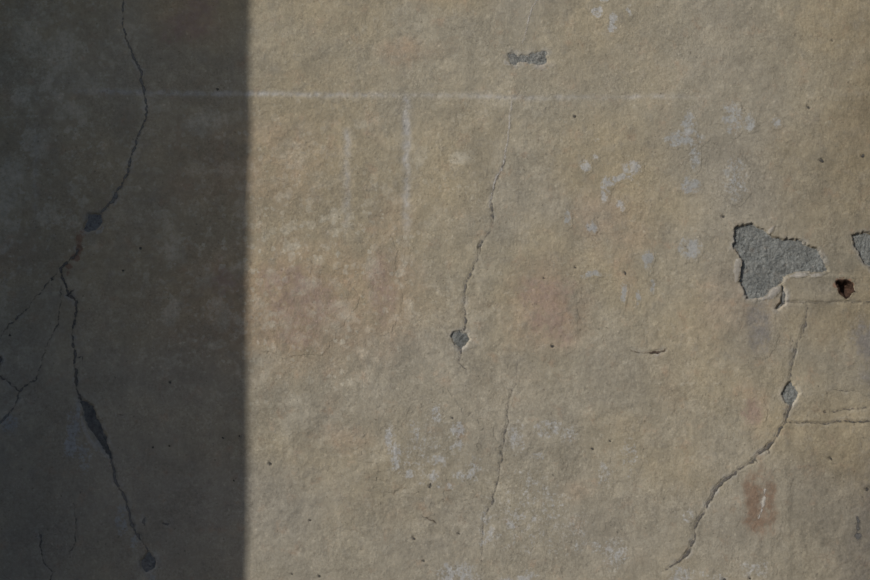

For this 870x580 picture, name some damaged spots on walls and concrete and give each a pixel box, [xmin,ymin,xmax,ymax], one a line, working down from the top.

crack [101,2,148,213]
flaking render [503,51,548,67]
crack [3,249,83,398]
crack [458,203,494,369]
flaking render [732,224,827,309]
crack [790,302,808,376]
crack [110,458,168,550]
crack [669,390,869,567]